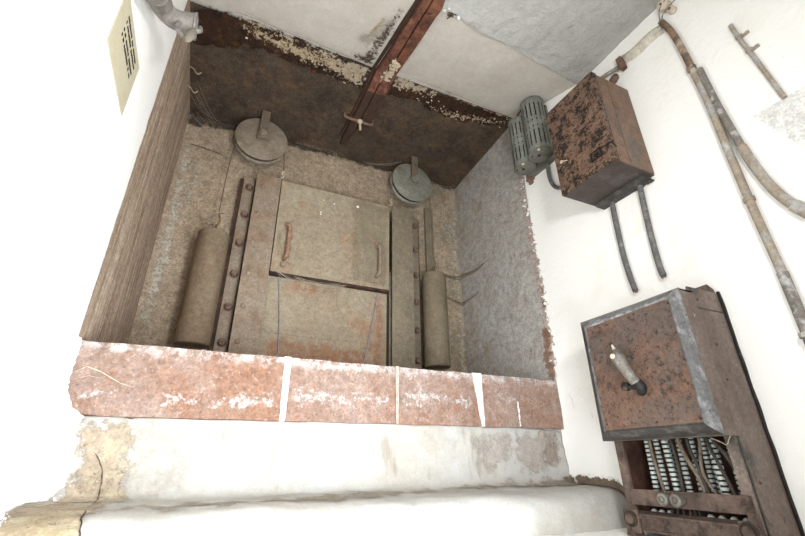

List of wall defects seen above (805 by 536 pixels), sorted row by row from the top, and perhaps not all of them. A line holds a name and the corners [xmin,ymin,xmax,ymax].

peeling [194,8,372,89]
peeling [388,77,509,128]
corrosion [542,328,555,379]
peeling [0,419,187,536]
crack [79,455,123,536]